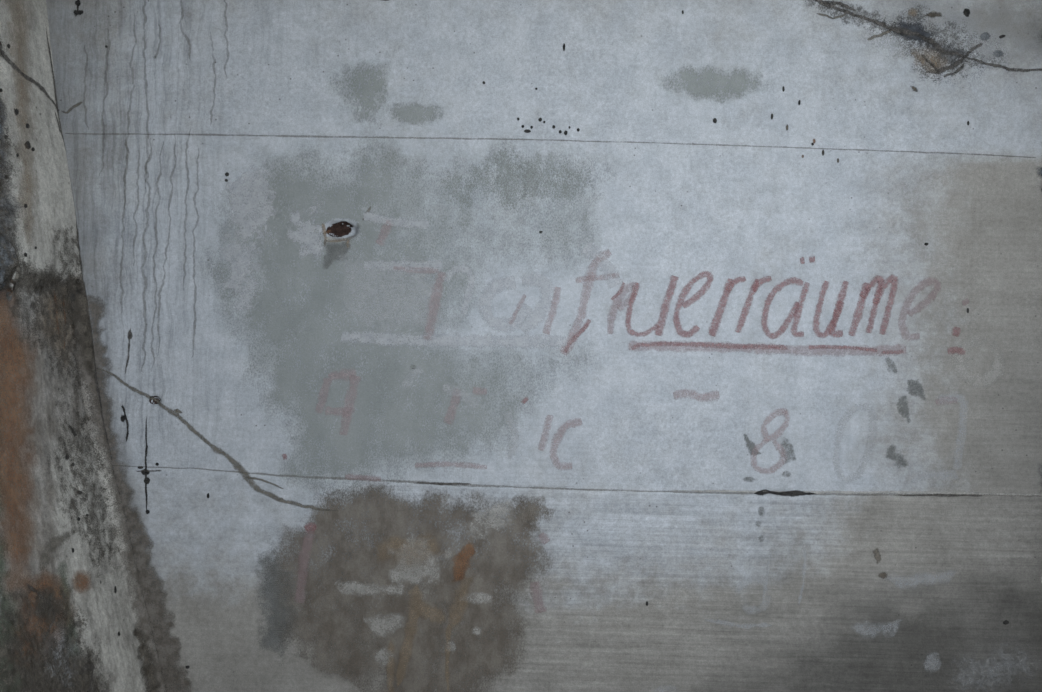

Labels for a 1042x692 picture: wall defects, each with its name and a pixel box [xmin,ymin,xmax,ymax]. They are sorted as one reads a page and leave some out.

crack [808,0,1042,83]
crack [0,29,83,278]
crack [97,368,335,511]
water stain [260,486,551,692]